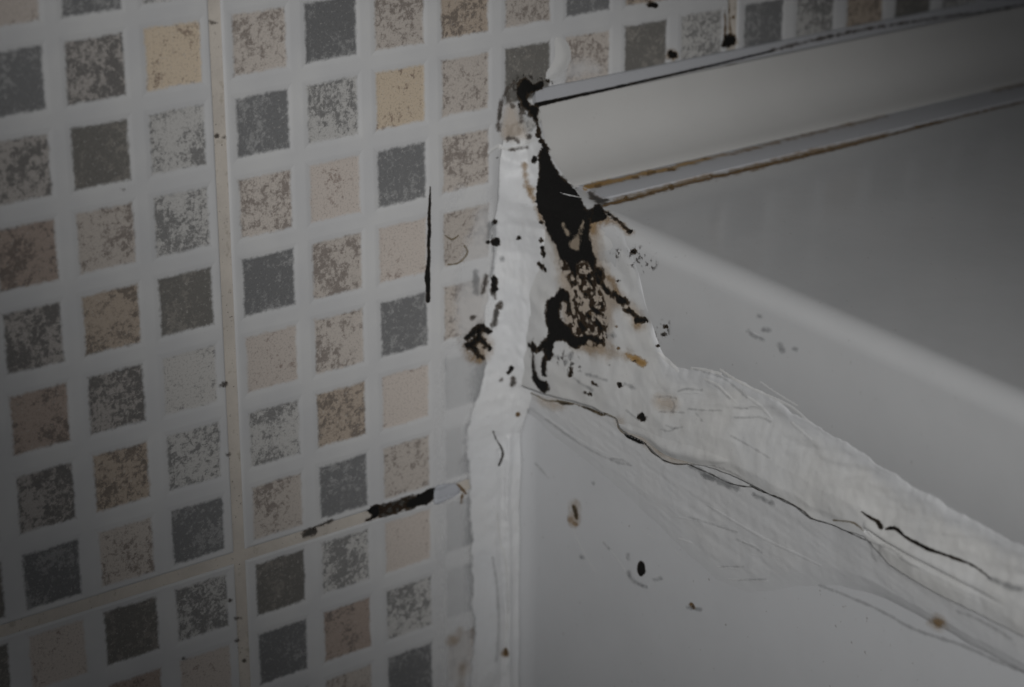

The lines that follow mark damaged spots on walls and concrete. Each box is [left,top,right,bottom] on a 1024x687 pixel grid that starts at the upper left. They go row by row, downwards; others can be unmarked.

crack [424,187,468,303]
damp [496,6,1011,394]
damp [463,274,503,362]
peeling [612,421,729,466]
crack [531,393,990,579]